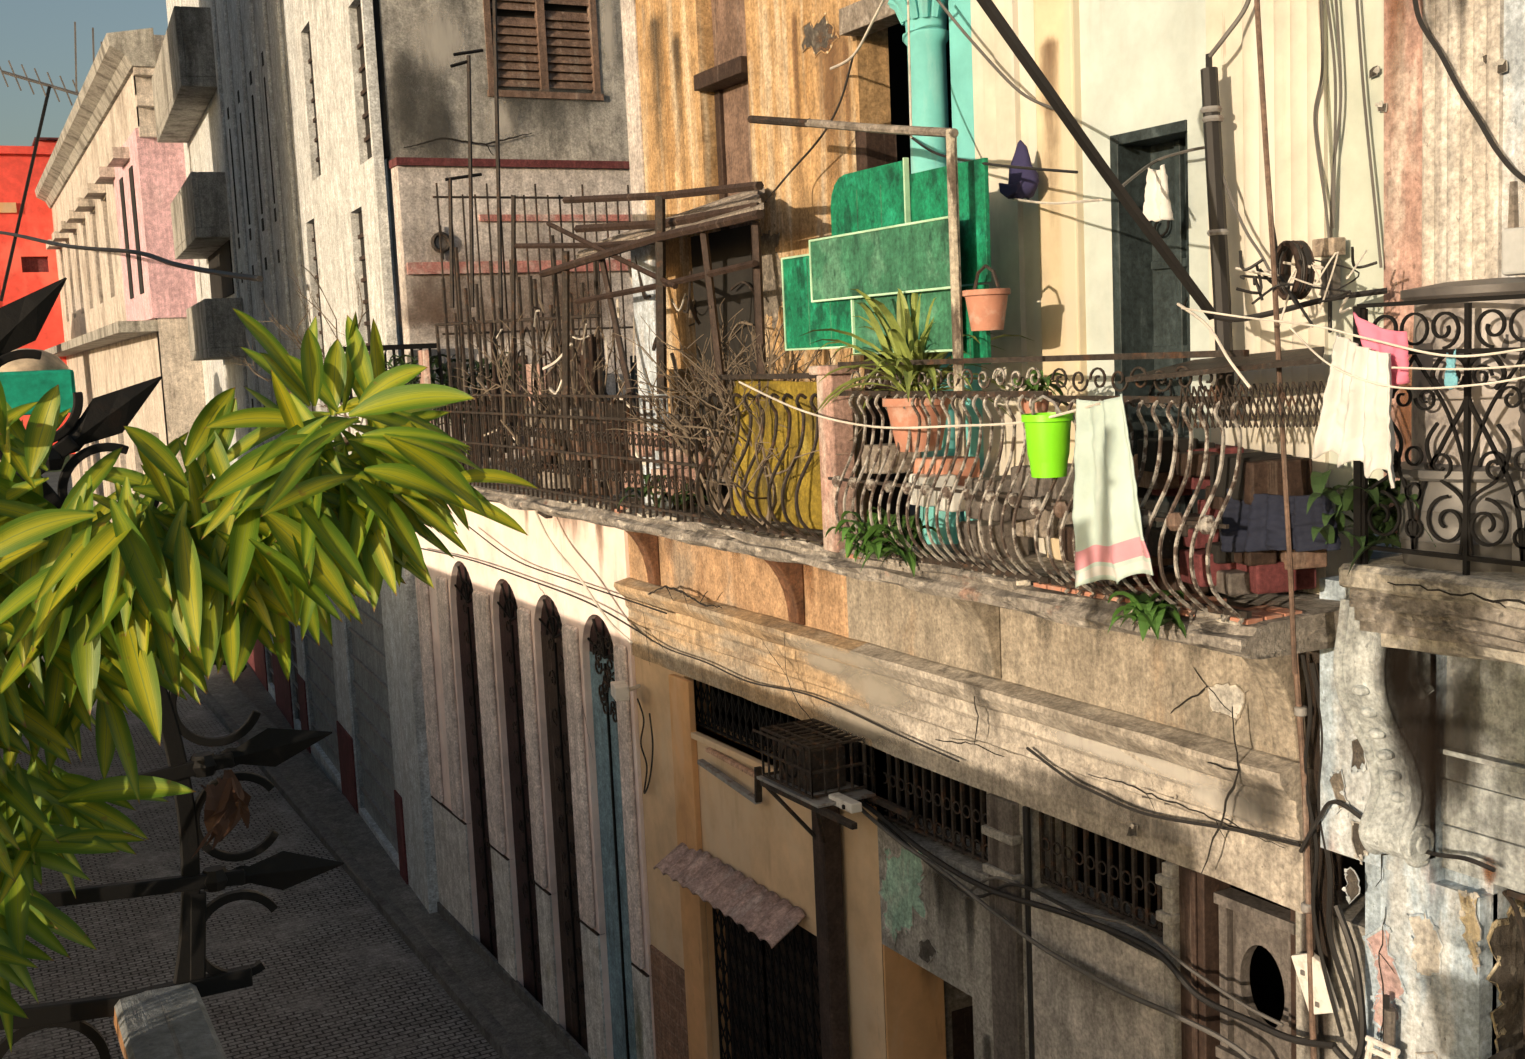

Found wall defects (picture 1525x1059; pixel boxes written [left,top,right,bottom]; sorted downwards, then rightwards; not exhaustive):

spalling [1204,682,1249,725]
crack [1088,667,1286,875]
peeling [878,840,938,964]
peeling [1362,909,1444,1039]
spalling [1458,890,1525,1059]